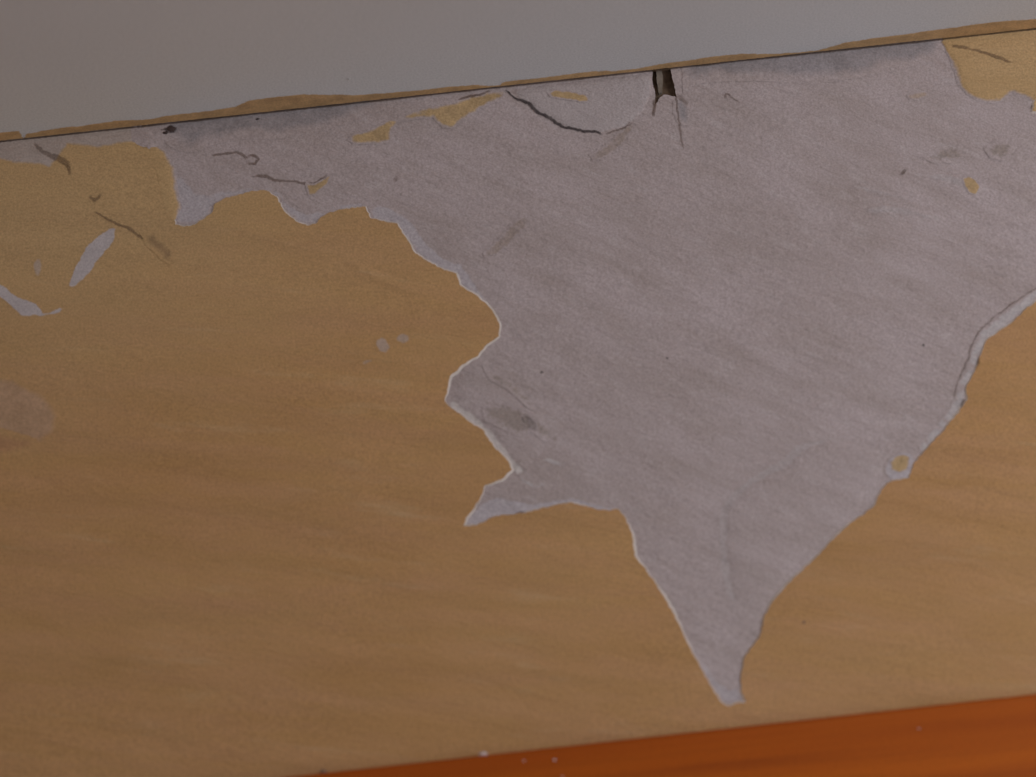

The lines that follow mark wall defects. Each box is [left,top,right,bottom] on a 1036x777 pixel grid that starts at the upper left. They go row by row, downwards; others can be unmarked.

crack [0,28,1036,142]
peeling [0,127,137,170]
spalling [67,227,117,290]
spalling [0,284,65,317]
peeling [131,38,1036,706]